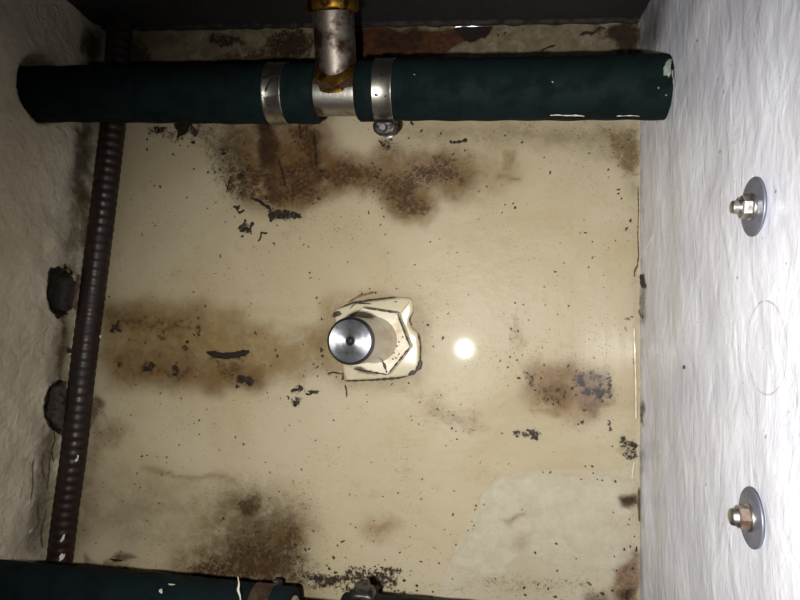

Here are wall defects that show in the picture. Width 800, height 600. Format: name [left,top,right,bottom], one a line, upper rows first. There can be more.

rust [355,25,507,62]
rust [233,124,472,217]
spalling [47,264,80,319]
damp [107,305,324,385]
spalling [29,380,67,548]
damp [181,492,410,594]